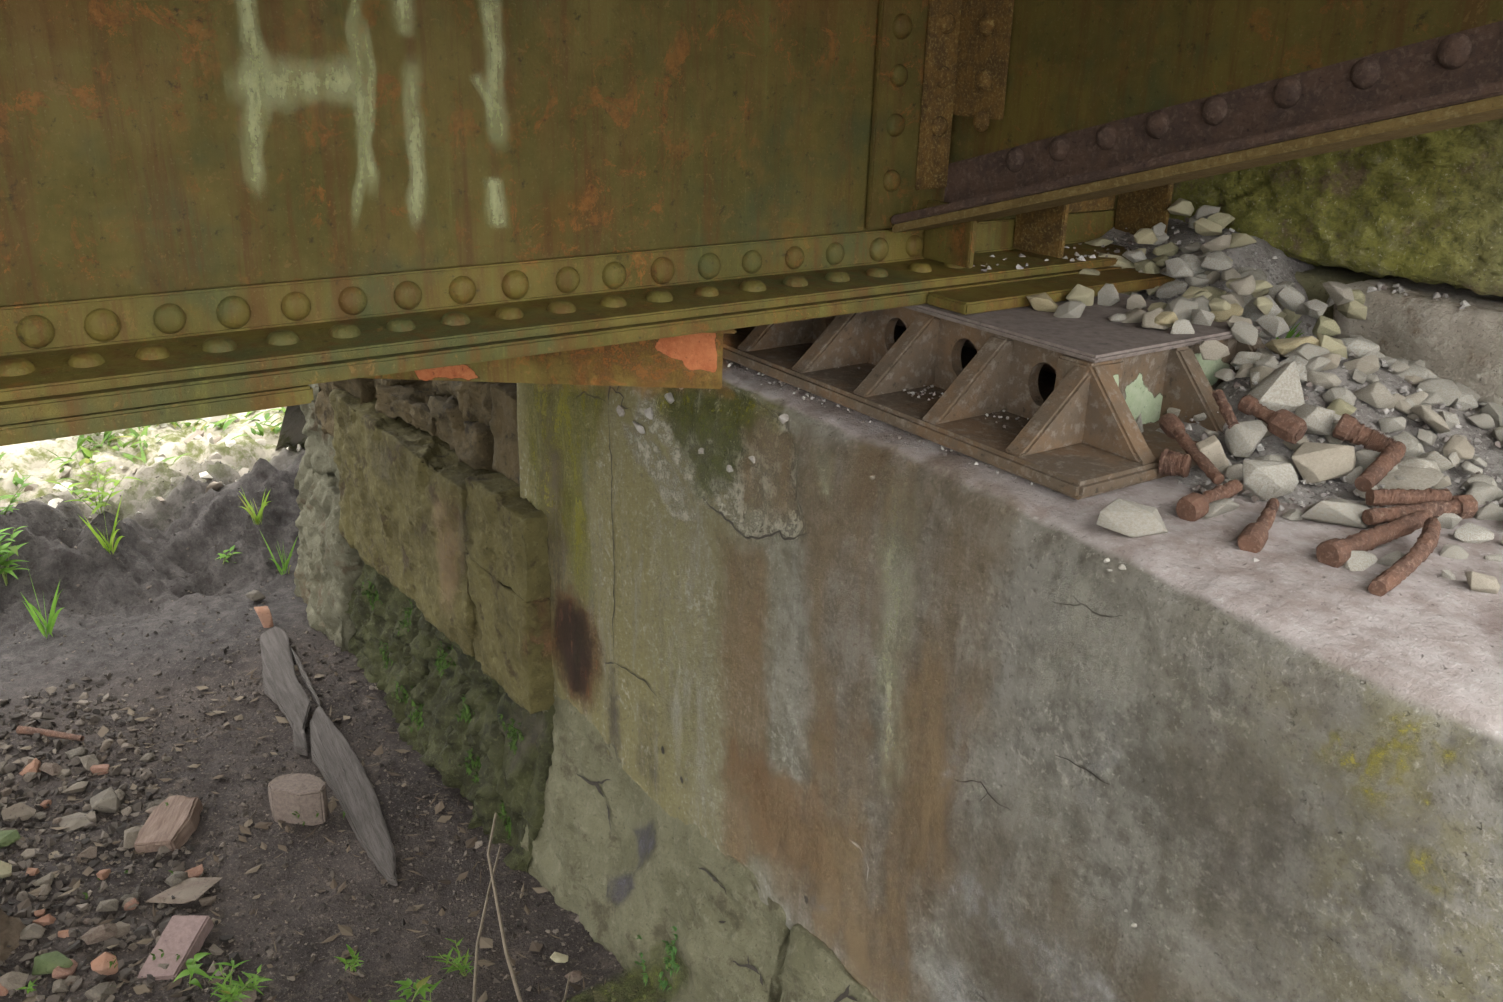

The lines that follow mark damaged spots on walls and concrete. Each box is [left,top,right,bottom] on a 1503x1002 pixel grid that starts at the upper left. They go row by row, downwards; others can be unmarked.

spalling [616,333,810,541]